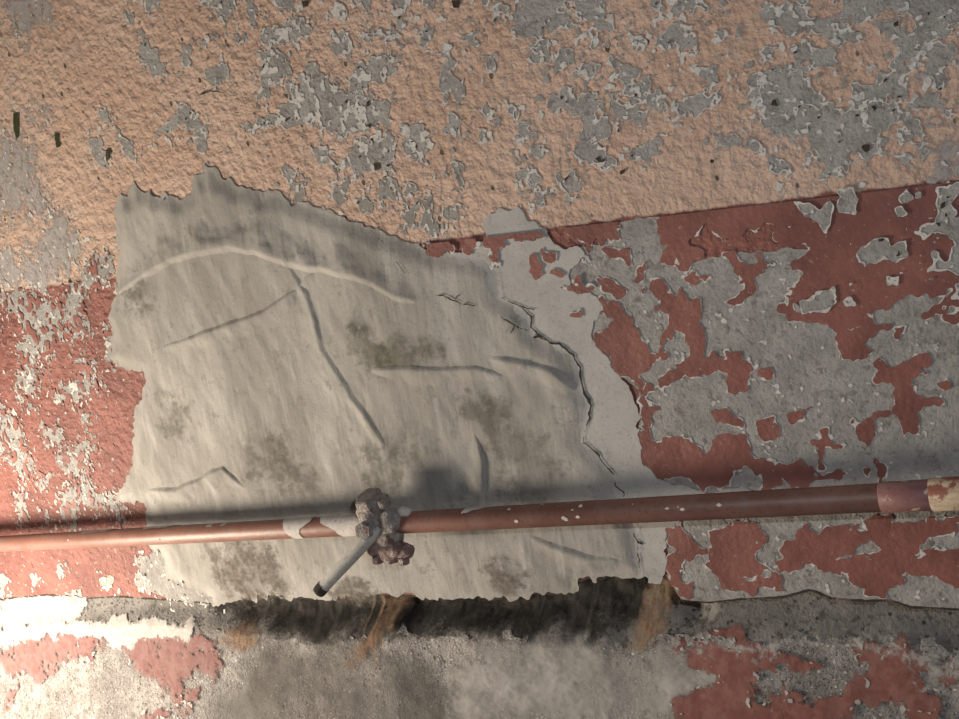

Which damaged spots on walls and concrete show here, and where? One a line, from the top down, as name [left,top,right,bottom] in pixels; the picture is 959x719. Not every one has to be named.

peeling [79,87,214,179]
peeling [0,97,131,533]
crack [435,294,475,306]
peeling [123,0,959,493]
crack [500,297,624,497]
spalling [0,549,576,719]
spalling [587,511,959,719]